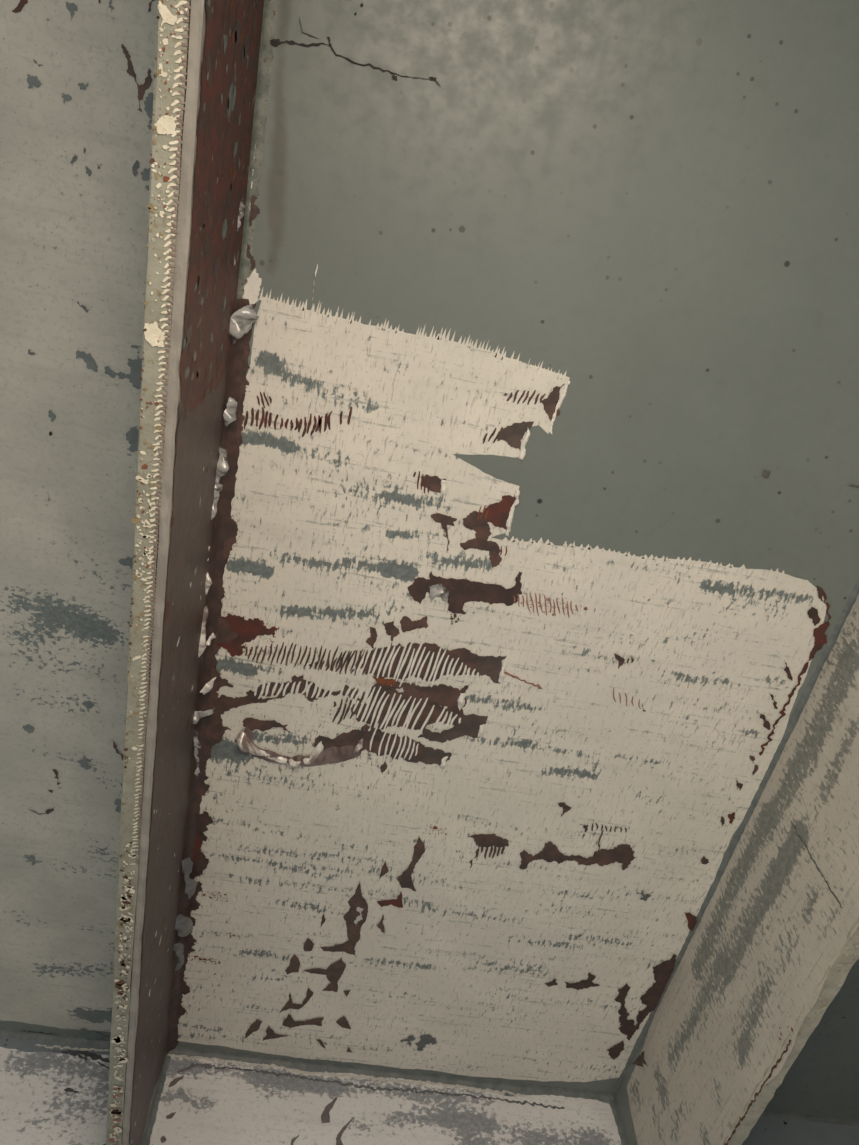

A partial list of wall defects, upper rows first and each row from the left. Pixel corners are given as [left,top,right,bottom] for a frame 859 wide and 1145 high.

crack [269,17,441,87]
peeling [0,0,179,1145]
corrosion [115,0,588,1145]
peeling [149,289,859,1145]
corrosion [724,1009,796,1145]